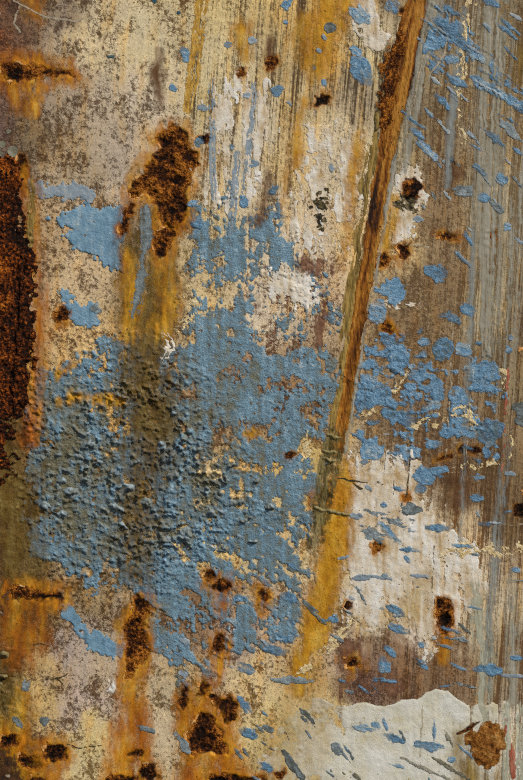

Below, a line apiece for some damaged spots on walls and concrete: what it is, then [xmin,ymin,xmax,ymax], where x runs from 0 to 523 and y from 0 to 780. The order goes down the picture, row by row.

peeling [352,0,391,56]
corrosion [115,120,200,343]
peeling [374,161,430,270]
corrosion [383,177,424,250]
spalling [435,230,460,242]
corrosion [0,153,49,486]
peeling [23,56,373,696]
peeling [293,320,523,677]
corrosion [105,593,158,780]
corrosion [174,678,267,780]
peeling [257,689,523,780]
corrosion [457,721,506,771]